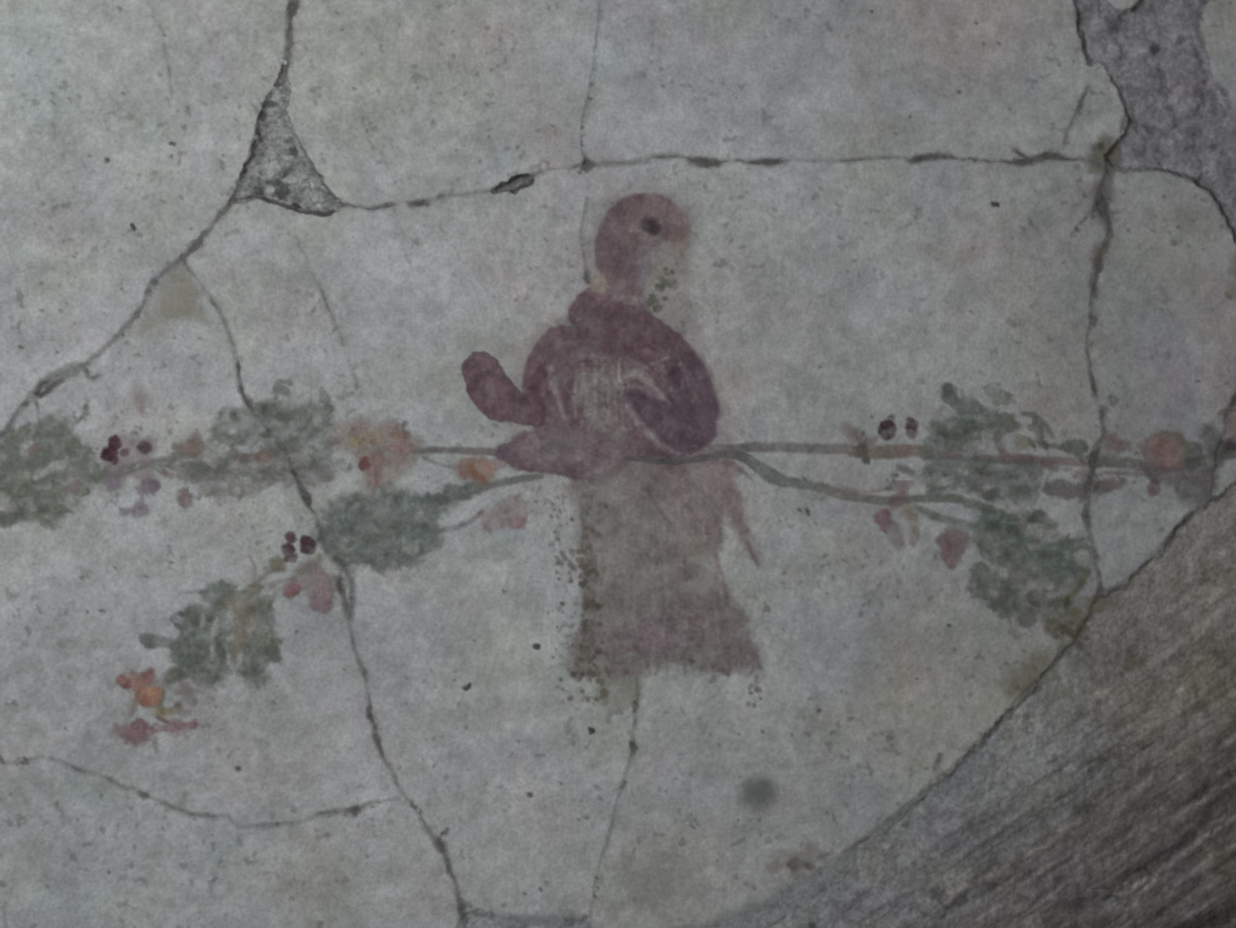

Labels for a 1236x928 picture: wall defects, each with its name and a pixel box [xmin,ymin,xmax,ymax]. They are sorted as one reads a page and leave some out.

crack [283,1,298,77]
crack [117,197,237,337]
spalling [229,58,344,216]
crack [328,194,442,210]
crack [657,155,784,166]
crack [912,150,1076,165]
spalling [1073,0,1236,243]
crack [0,363,99,438]
crack [1075,160,1121,593]
crack [236,360,467,923]
spalling [705,482,1236,928]
spalling [461,909,590,928]